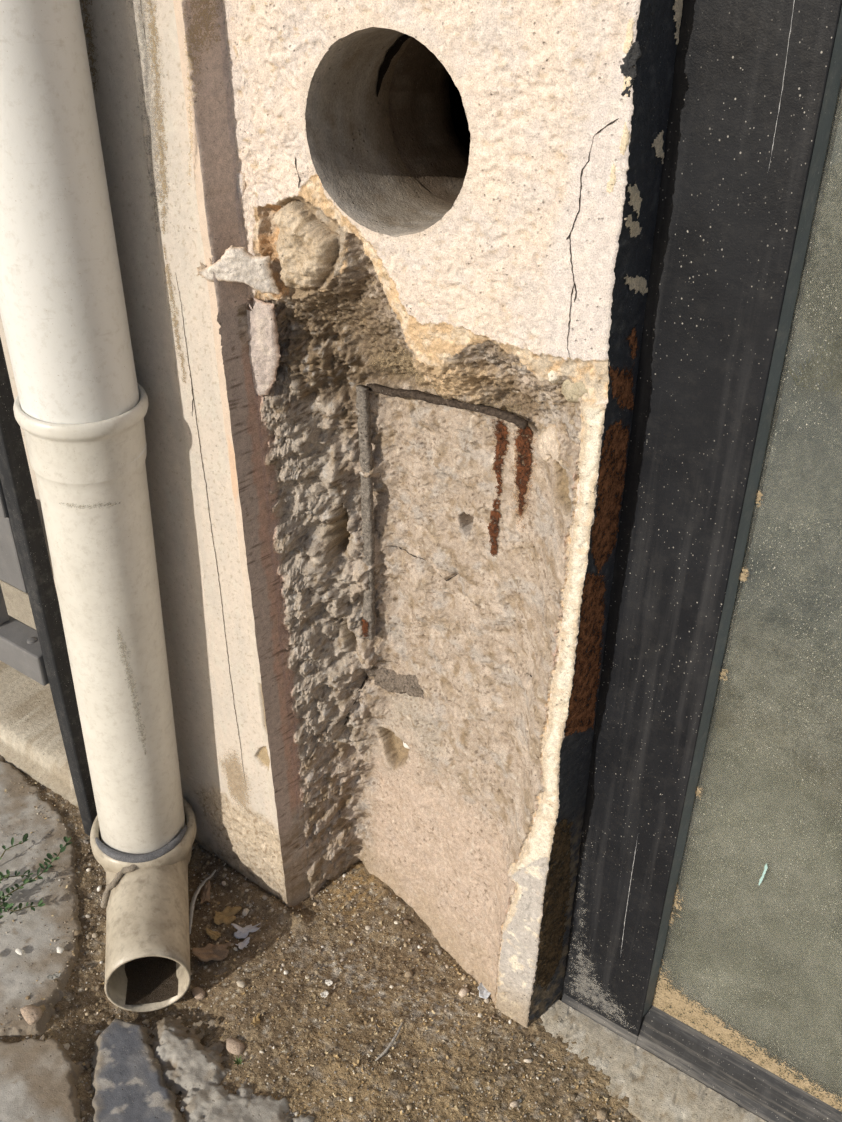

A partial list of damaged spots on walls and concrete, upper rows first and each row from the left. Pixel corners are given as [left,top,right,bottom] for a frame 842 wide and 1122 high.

crack [566,118,619,357]
spalling [194,171,610,1028]
corrosion [487,419,533,557]
corrosion [565,327,638,737]